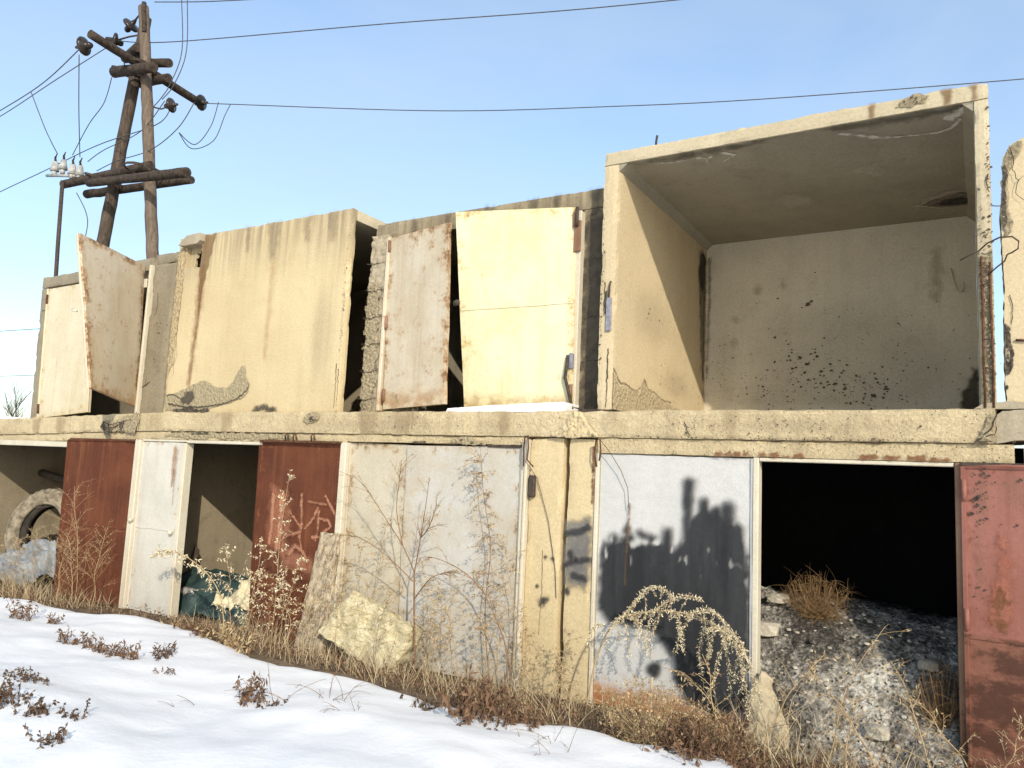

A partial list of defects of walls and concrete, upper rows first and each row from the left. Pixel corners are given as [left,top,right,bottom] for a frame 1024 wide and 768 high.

corrosion [715,450,804,458]
corrosion [858,454,950,462]